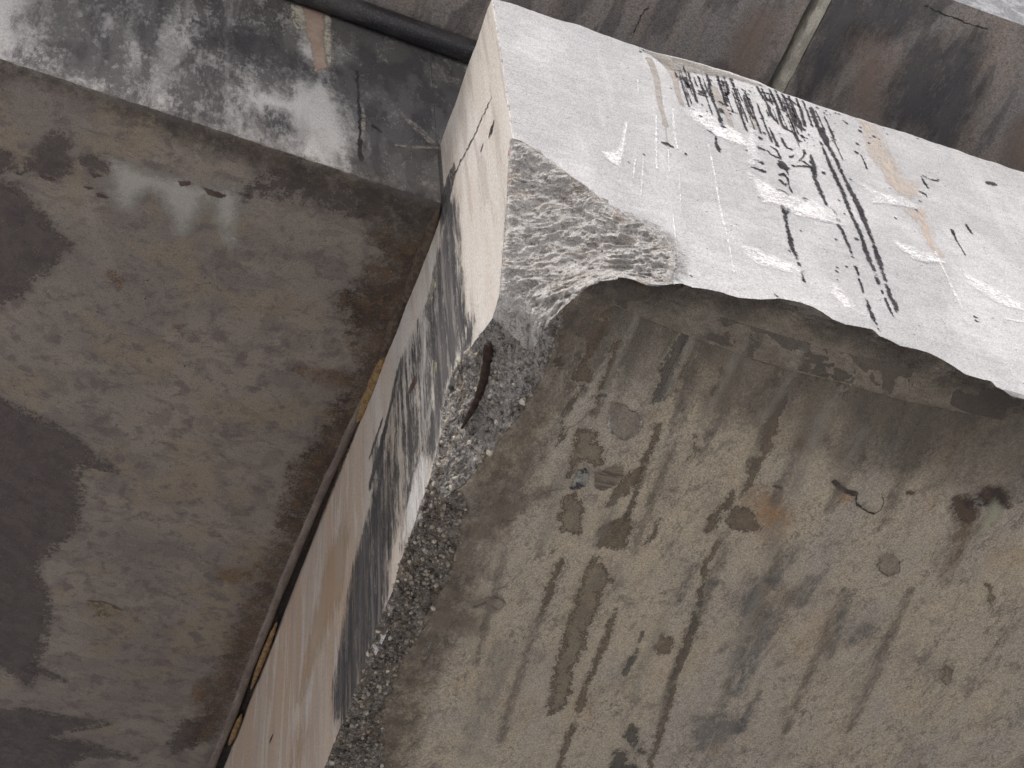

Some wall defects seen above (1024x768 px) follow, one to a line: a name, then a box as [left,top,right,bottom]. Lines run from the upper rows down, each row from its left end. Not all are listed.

crack [356,71,382,161]
crack [453,96,494,176]
damp [603,0,983,332]
damp [0,0,475,730]
damp [539,549,566,617]
damp [553,307,627,480]
damp [545,423,662,768]
damp [650,333,692,405]
spalling [324,138,1024,768]
damp [608,357,804,768]
crack [831,480,884,515]
efflorescence [964,275,1024,322]